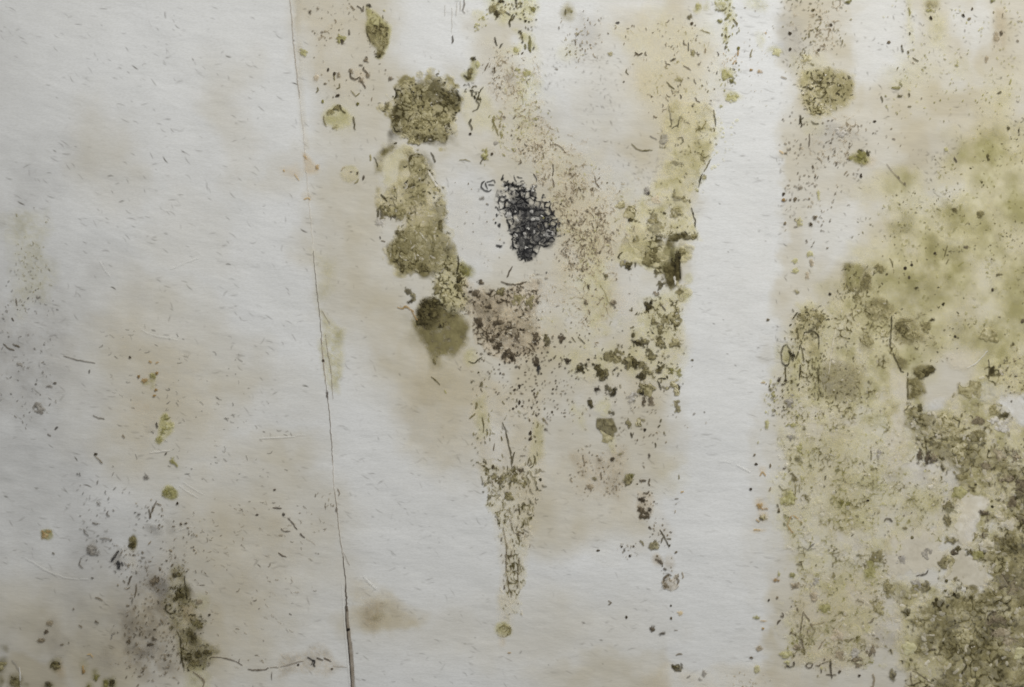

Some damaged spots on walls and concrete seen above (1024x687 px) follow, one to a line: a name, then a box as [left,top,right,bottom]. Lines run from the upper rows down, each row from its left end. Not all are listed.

mould [715,1,760,107]
mould [773,0,879,231]
water stain [314,0,697,609]
water stain [761,127,1024,687]
mould [0,660,21,687]
mould [79,486,215,687]
crack [211,489,354,687]